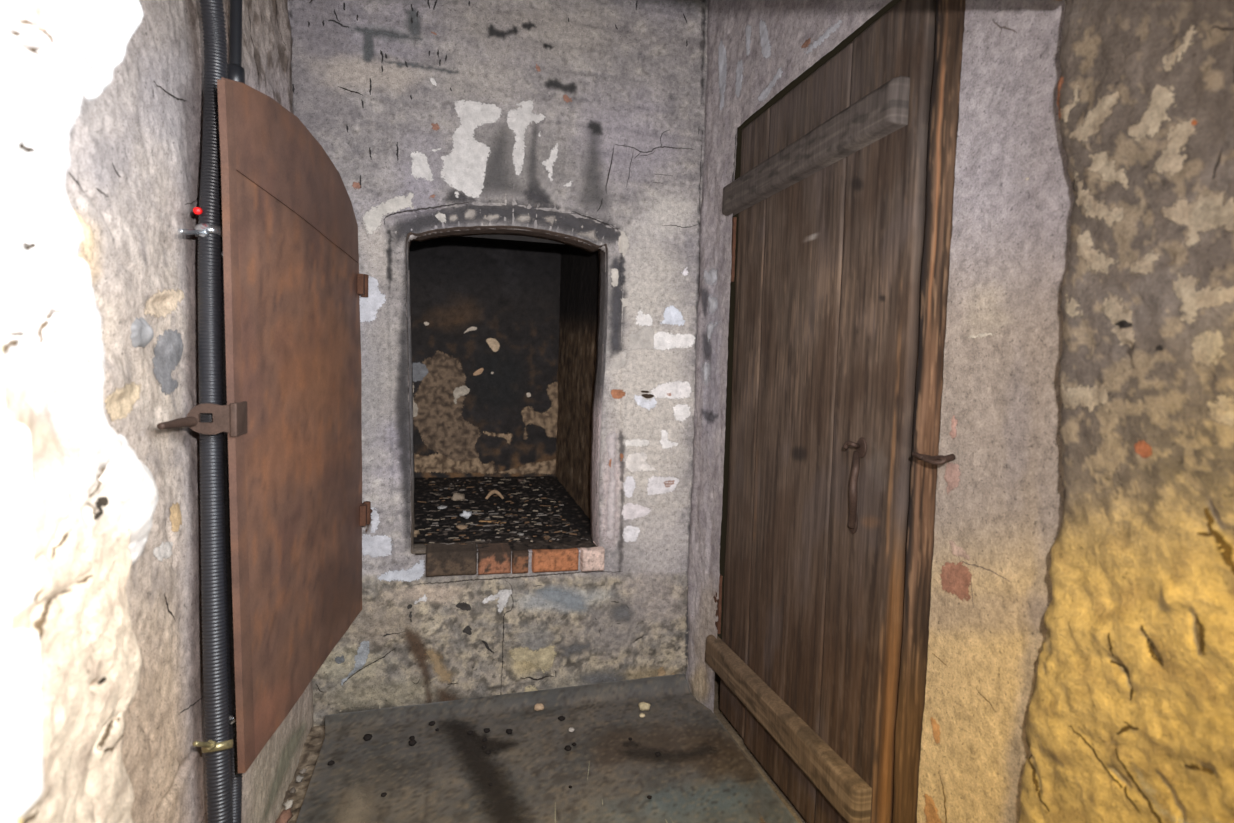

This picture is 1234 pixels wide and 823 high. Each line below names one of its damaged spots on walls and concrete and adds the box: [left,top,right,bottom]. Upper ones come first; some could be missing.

flaking render [363,99,546,235]
flaking render [541,142,573,187]
damp [585,149,603,205]
crack [384,202,469,225]
crack [572,130,703,294]
flaking render [610,326,654,371]
spalling [412,350,558,482]
spalling [611,389,626,399]
flaking render [437,492,472,530]
crack [1197,508,1234,573]
damp [476,736,516,752]
crack [1070,625,1163,823]